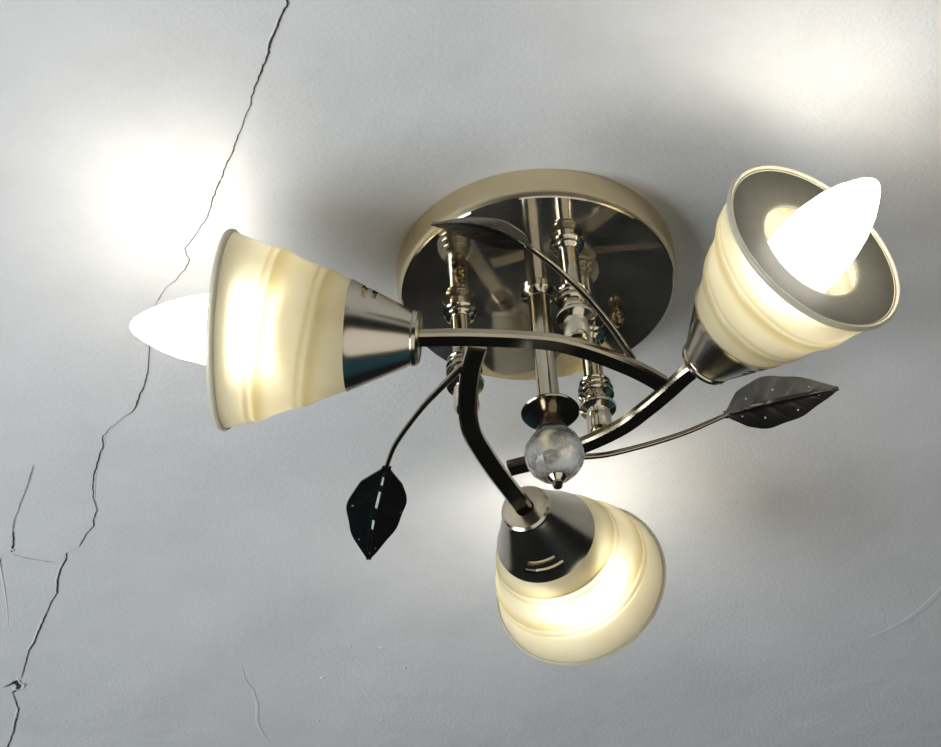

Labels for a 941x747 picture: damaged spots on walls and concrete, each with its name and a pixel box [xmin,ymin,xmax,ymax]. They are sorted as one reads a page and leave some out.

crack [155,0,289,307]
crack [7,345,150,747]